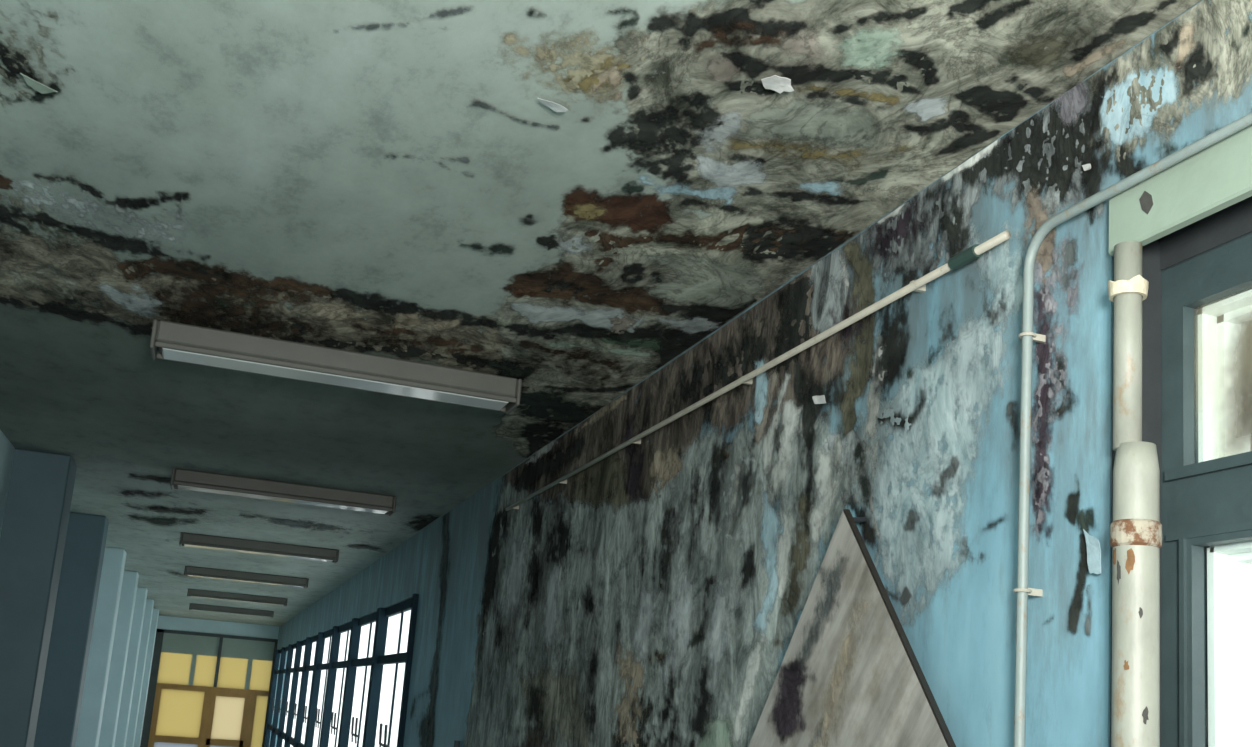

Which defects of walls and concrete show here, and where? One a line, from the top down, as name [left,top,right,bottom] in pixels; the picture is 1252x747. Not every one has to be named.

damp [461,244,514,254]
corrosion [563,186,673,234]
spalling [0,0,1252,458]
damp [496,0,1177,591]
damp [119,474,204,526]
damp [242,515,385,552]
damp [409,515,439,531]
peeling [1066,484,1101,635]
corrosion [1113,548,1135,584]
damp [772,558,867,747]